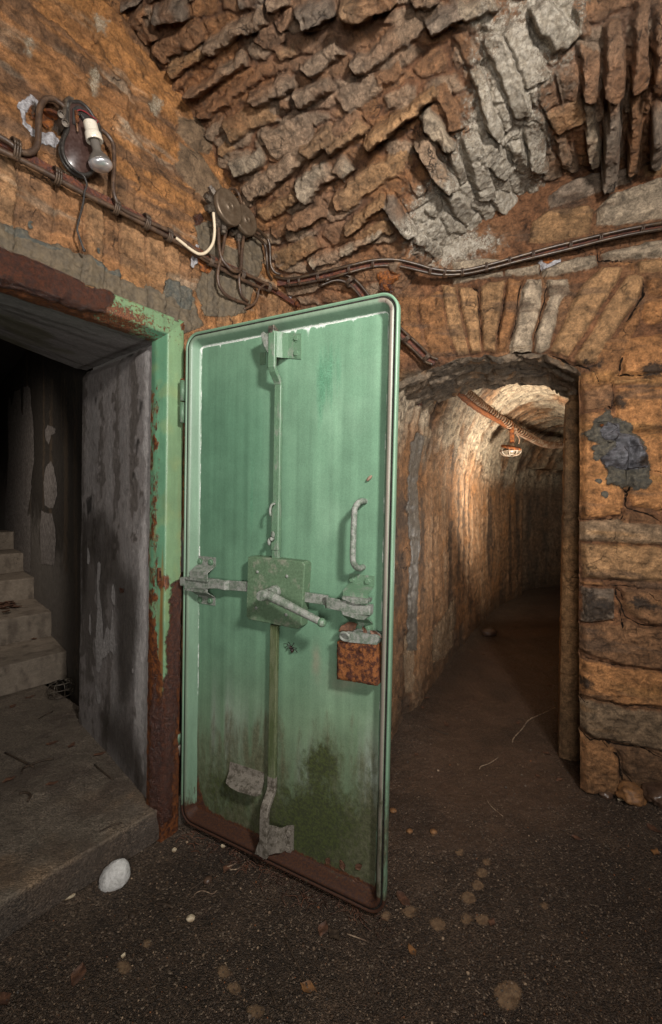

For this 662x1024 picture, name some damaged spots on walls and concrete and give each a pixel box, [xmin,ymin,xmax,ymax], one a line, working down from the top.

corrosion [0,247,115,313]
peeling [5,386,57,573]
damp [82,496,134,701]
corrosion [148,578,182,826]